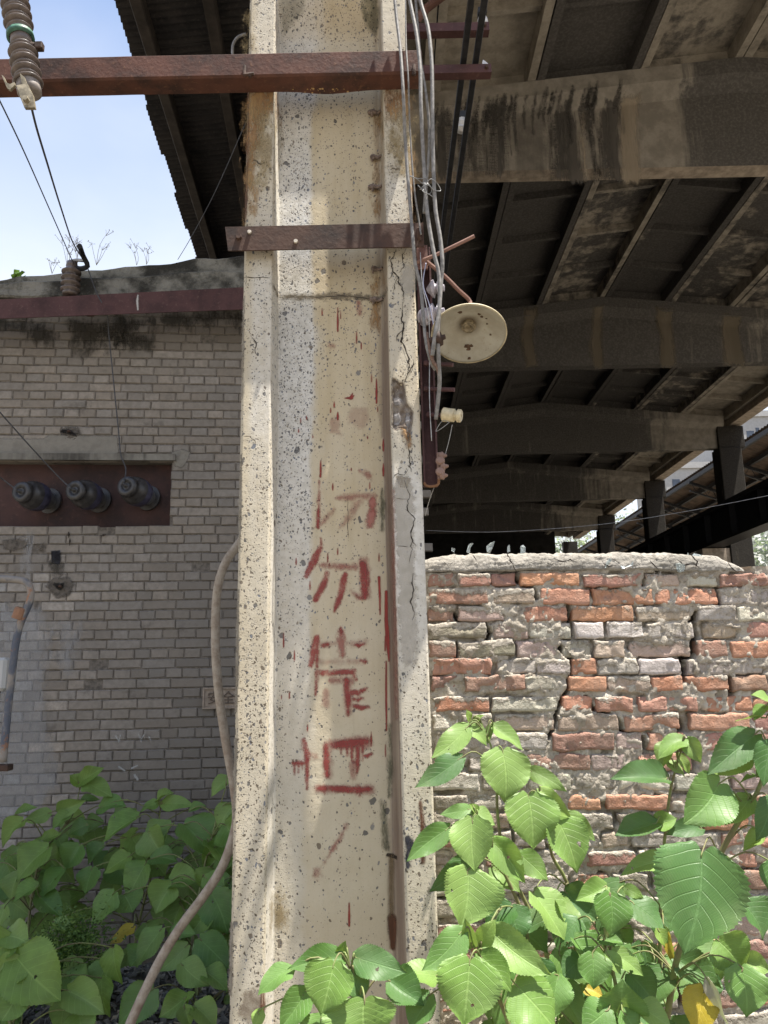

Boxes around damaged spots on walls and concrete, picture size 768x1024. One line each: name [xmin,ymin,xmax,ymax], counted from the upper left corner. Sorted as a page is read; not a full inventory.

rust [243,92,279,218]
leakage [434,81,640,184]
leakage [0,319,53,344]
leakage [69,311,243,353]
crack [390,250,414,384]
spalling [391,378,413,449]
crack [393,449,415,620]